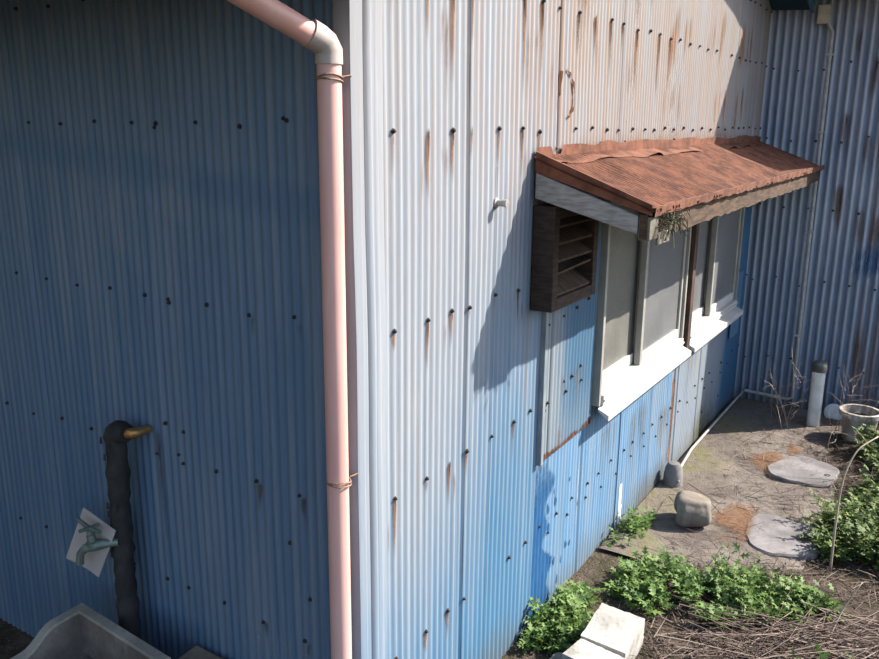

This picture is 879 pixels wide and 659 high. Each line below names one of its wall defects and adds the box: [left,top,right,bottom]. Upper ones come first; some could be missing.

corrosion [447,0,455,54]
corrosion [656,21,690,78]
corrosion [539,418,591,467]